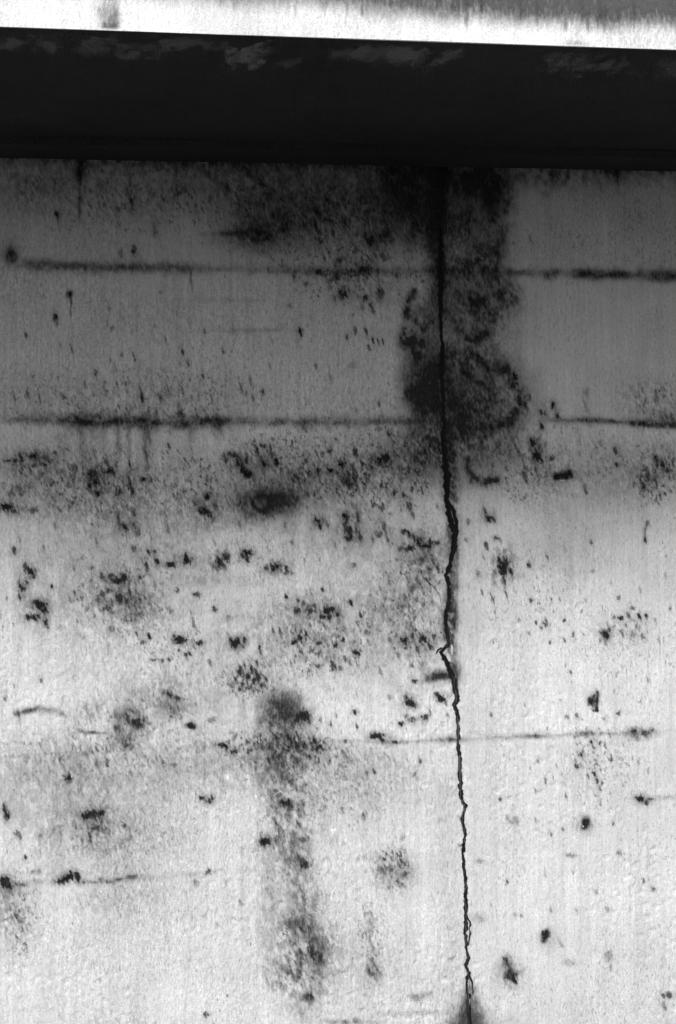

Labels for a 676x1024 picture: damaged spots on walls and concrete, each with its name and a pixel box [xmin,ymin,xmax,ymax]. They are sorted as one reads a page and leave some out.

damp [574,271,676,279]
damp [57,409,250,429]
damp [223,166,559,726]
damp [46,460,134,496]
damp [100,510,193,611]
damp [215,549,252,568]
damp [18,563,49,625]
crack [427,167,474,1024]
damp [152,635,203,661]
damp [215,645,337,818]
damp [259,832,309,898]
damp [282,920,324,980]